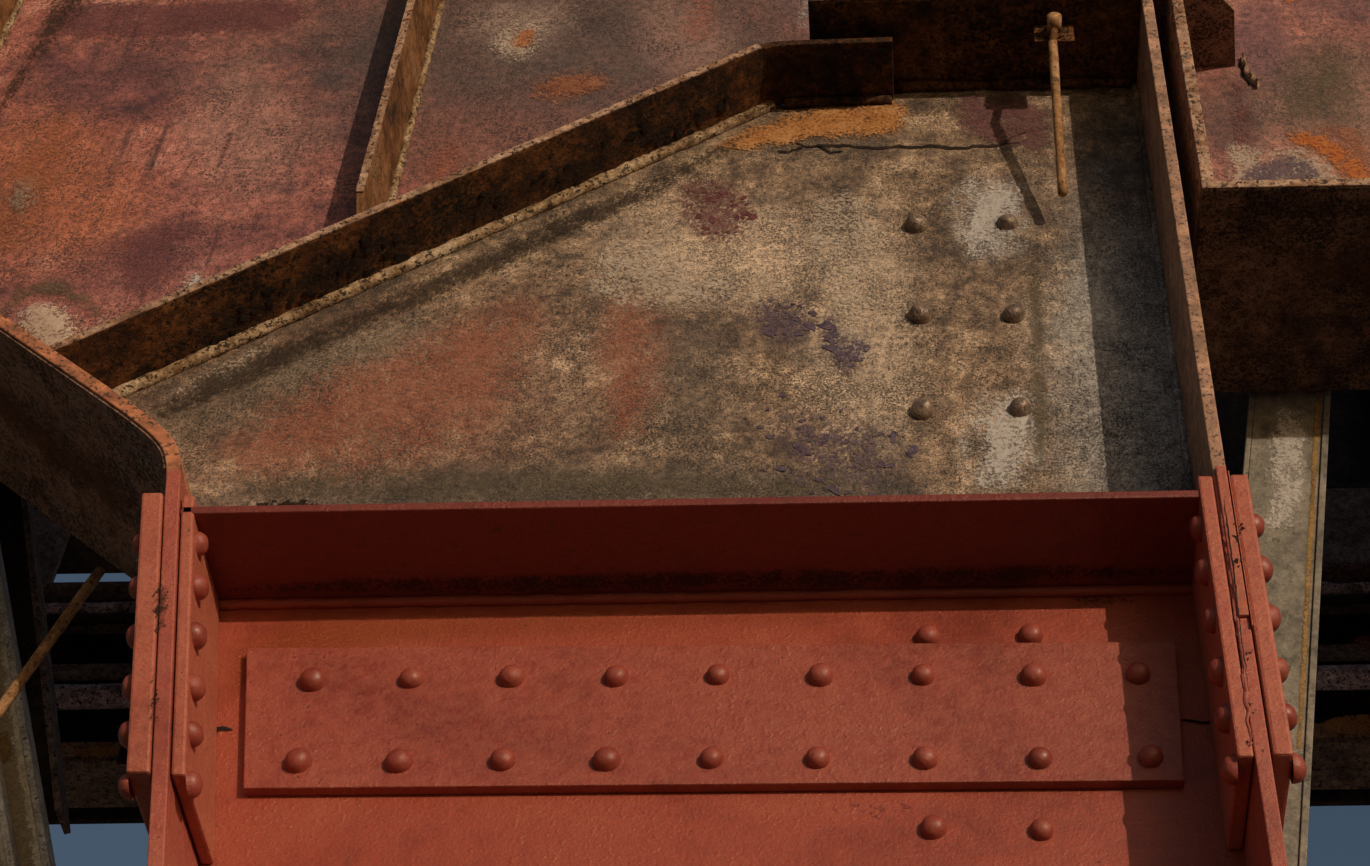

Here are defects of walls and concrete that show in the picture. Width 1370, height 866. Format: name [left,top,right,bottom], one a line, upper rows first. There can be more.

damp [495,23,538,57]
rust [532,73,609,100]
rust [711,100,909,152]
crack [777,132,1028,153]
rust [1228,131,1370,180]
peeling [677,180,757,241]
peeling [755,298,871,372]
peeling [756,393,919,496]